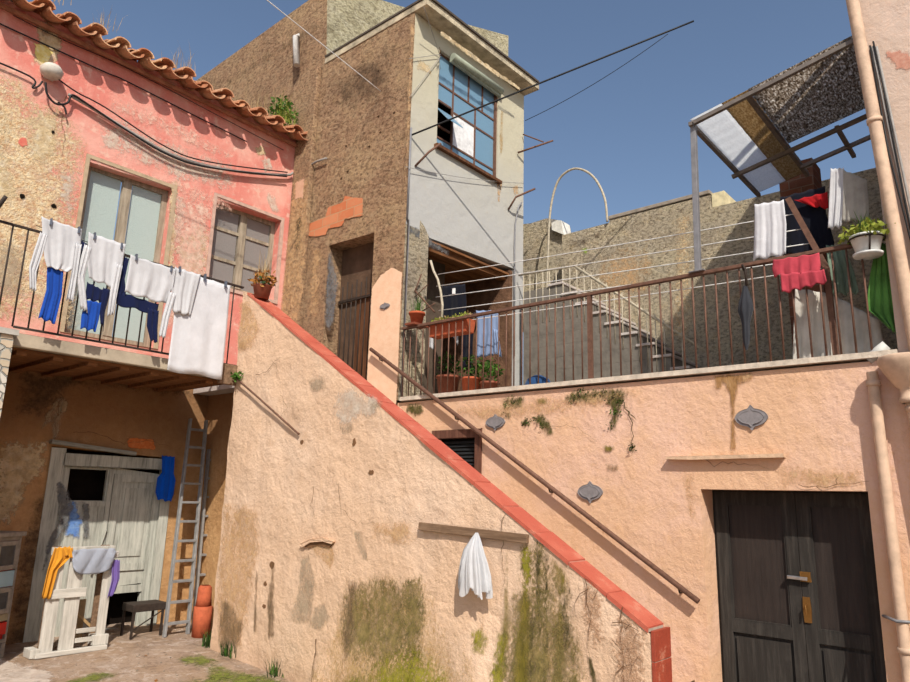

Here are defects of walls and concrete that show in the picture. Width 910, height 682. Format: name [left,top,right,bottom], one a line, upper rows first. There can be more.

peeling [886,50,910,69]
peeling [281,179,338,328]
rust [715,374,751,449]
peeling [0,398,67,524]
spalling [293,538,336,628]